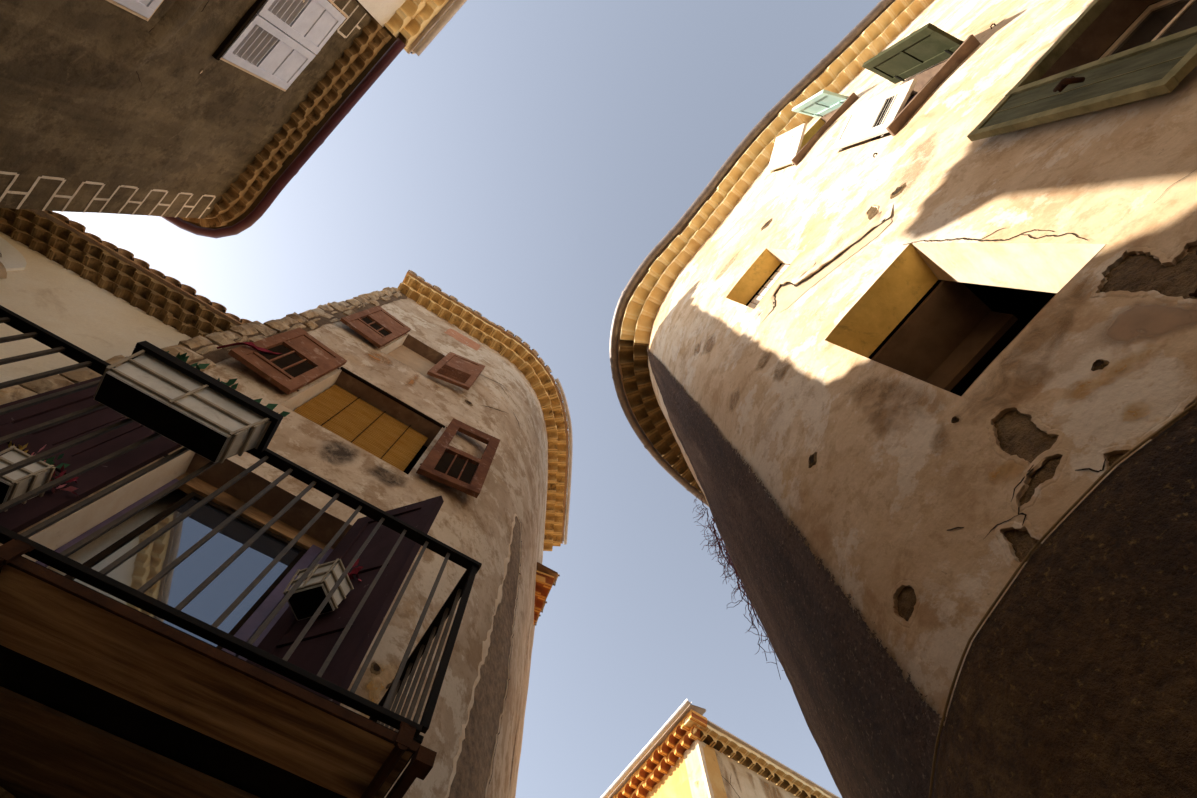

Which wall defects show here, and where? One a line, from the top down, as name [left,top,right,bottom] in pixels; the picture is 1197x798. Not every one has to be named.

crack [903,228,1086,245]
spalling [1089,236,1197,307]
spalling [1091,359,1110,371]
spalling [1096,390,1197,480]
spalling [985,403,1069,569]
spalling [890,580,921,628]